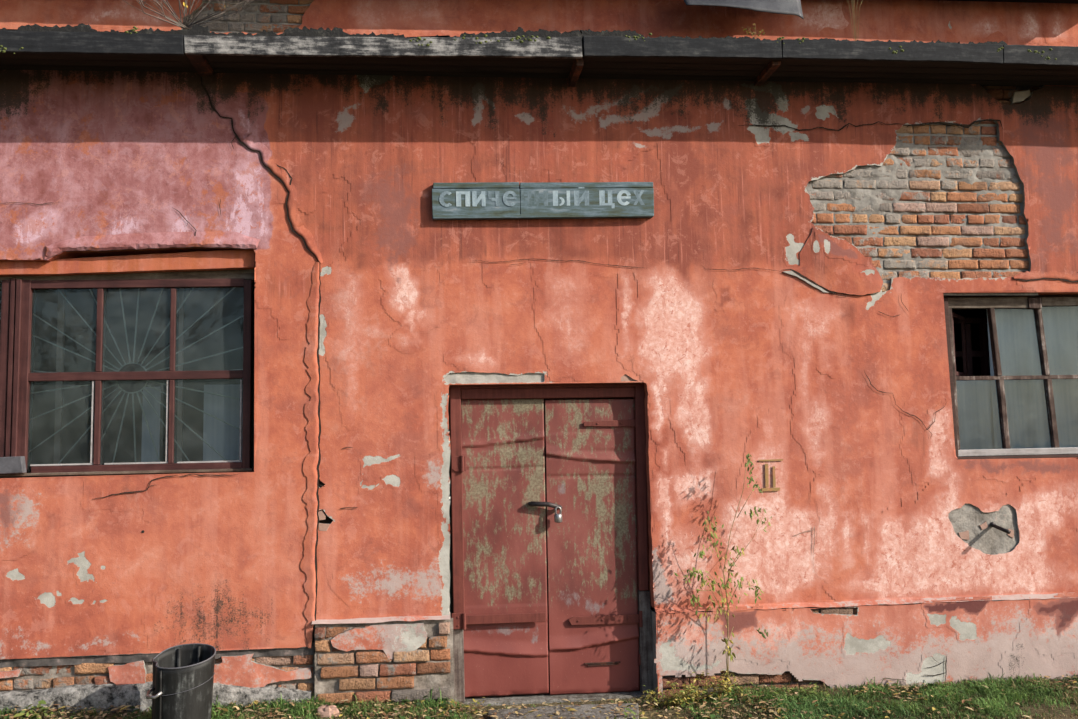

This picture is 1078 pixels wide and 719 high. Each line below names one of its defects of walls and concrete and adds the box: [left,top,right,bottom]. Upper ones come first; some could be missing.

leakage [0,70,231,197]
crack [738,119,1003,131]
spalling [783,121,1029,313]
crack [1014,270,1078,282]
crack [200,76,357,648]
leakage [211,73,1078,681]
leakage [81,475,172,523]
crack [95,474,239,499]
spalling [213,372,544,705]
spalling [948,503,1018,555]
leakage [193,581,234,633]
spalling [0,619,153,691]